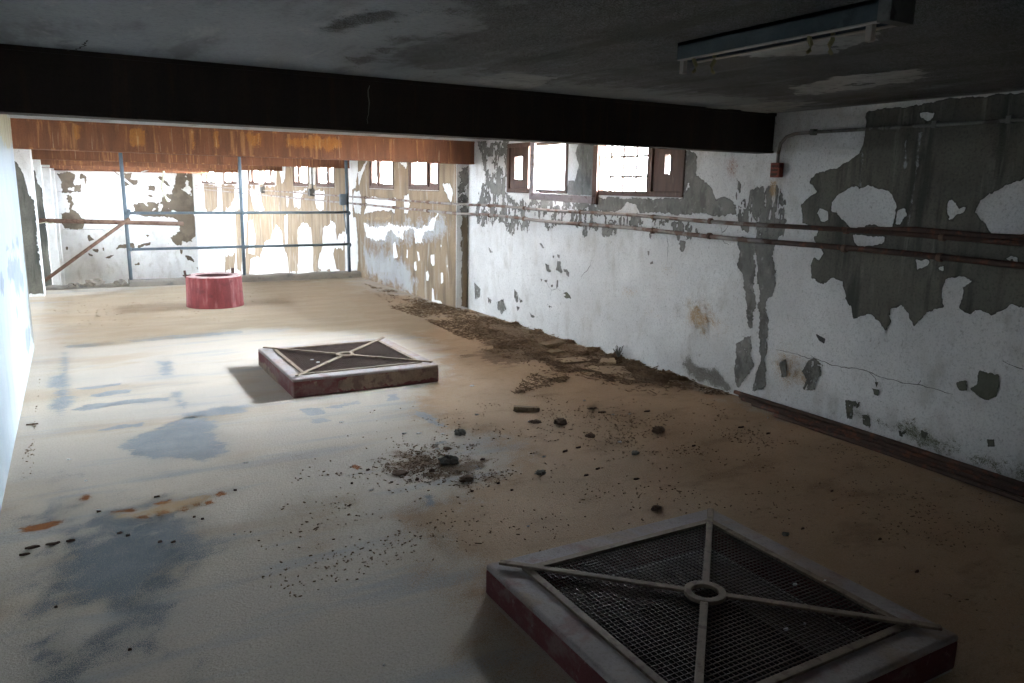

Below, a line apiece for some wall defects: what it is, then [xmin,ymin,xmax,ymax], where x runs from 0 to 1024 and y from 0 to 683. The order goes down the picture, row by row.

peeling [15,162,52,344]
peeling [57,172,151,258]
peeling [124,141,787,392]
peeling [801,92,1024,330]
damp [40,343,252,462]
peeling [802,359,823,391]
crack [780,350,950,394]
peeling [956,370,999,400]